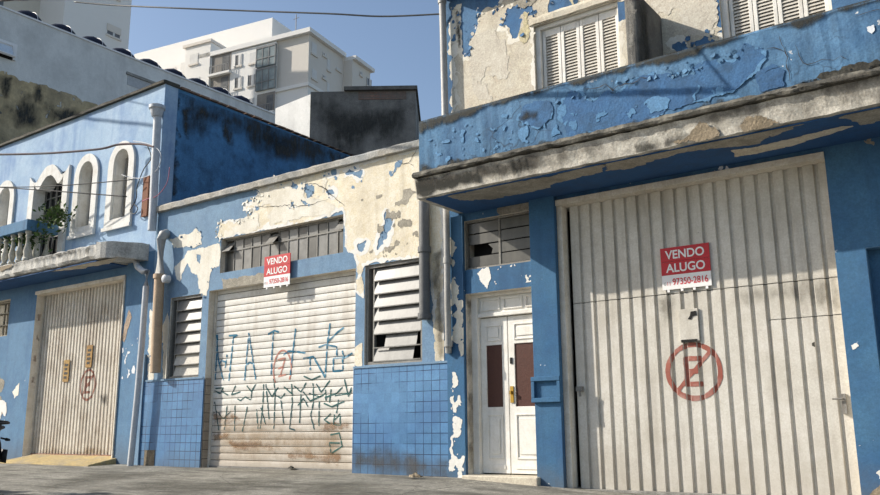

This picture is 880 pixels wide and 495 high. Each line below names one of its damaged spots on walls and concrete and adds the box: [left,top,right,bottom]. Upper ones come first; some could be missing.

damp [0,71,98,144]
damp [176,98,398,163]
peeling [447,0,624,113]
peeling [543,20,785,137]
peeling [448,108,880,215]
peeling [645,0,723,55]
crack [766,37,846,78]
spalling [801,59,880,83]
peeling [170,149,464,361]
peeling [477,264,515,288]
peeling [0,378,19,418]
peeling [449,372,465,478]